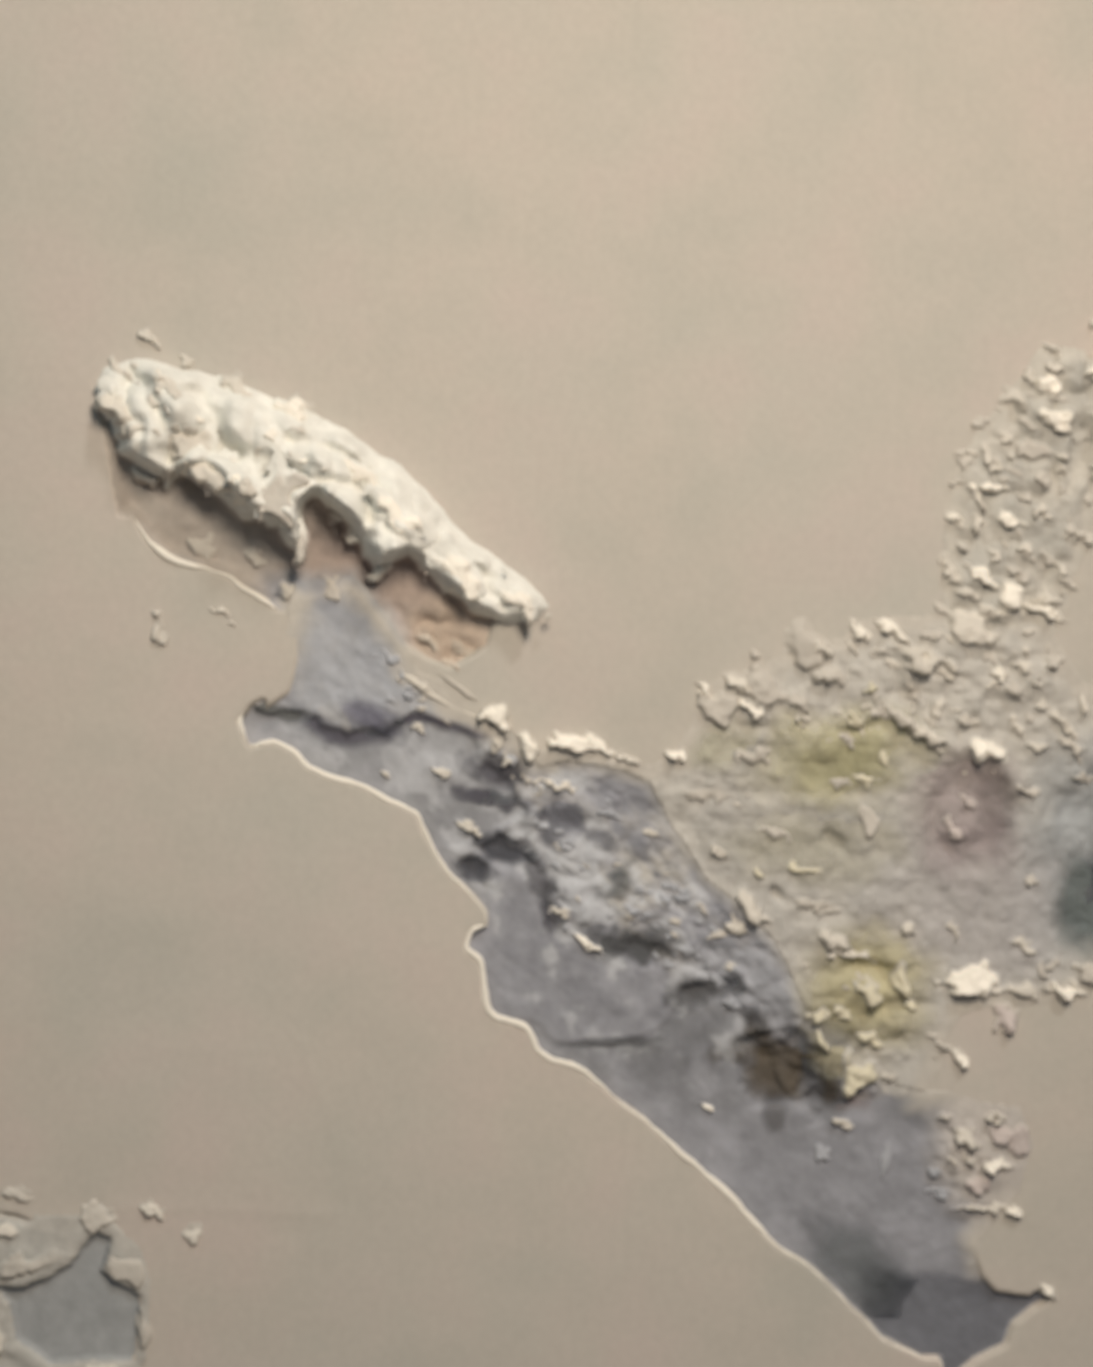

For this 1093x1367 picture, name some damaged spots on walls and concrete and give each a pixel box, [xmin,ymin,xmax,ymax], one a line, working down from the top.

flaking render [237,342,1093,1367]
flaking render [0,1185,153,1367]
flaking render [138,1198,167,1222]
flaking render [181,1222,203,1246]